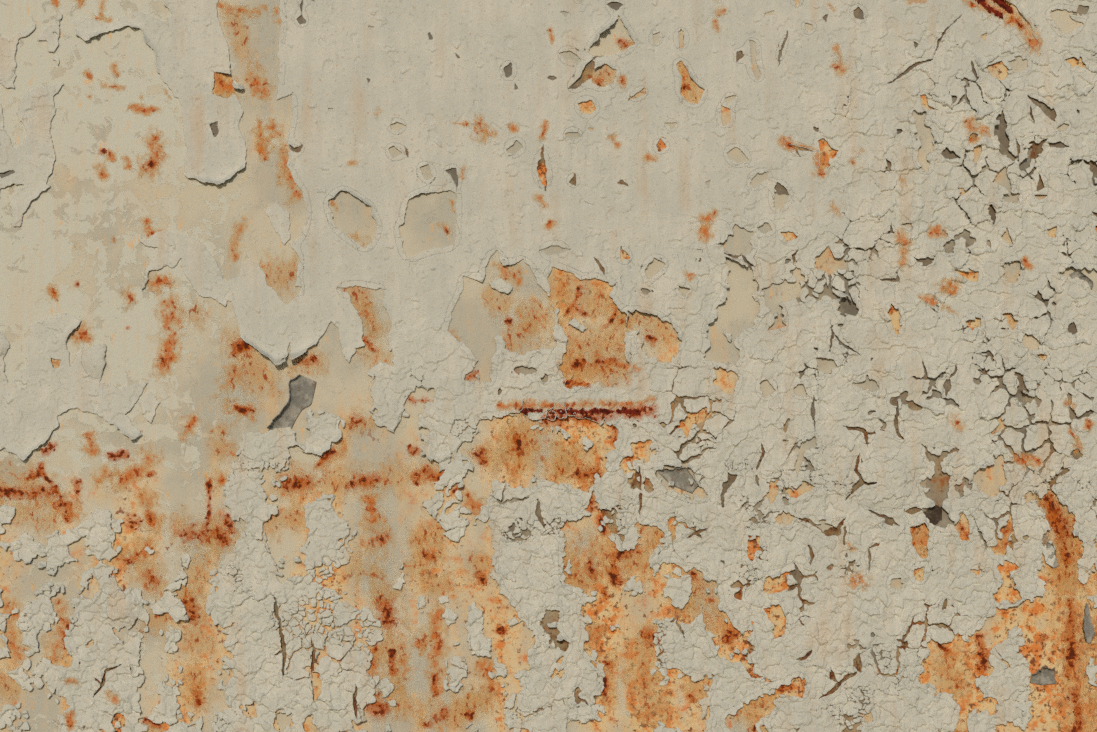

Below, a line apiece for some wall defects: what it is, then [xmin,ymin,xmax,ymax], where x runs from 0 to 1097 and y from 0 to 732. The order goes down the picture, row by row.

peeling [908,0,1097,208]
crack [998,101,1047,174]
rust [0,431,238,661]
rust [347,521,498,730]
peeling [0,0,864,732]
rust [469,397,656,487]
crack [630,443,769,541]
crack [796,611,926,732]
crack [782,365,959,584]
peeling [845,313,1097,732]
peeling [1001,263,1097,366]
rust [1039,492,1097,732]